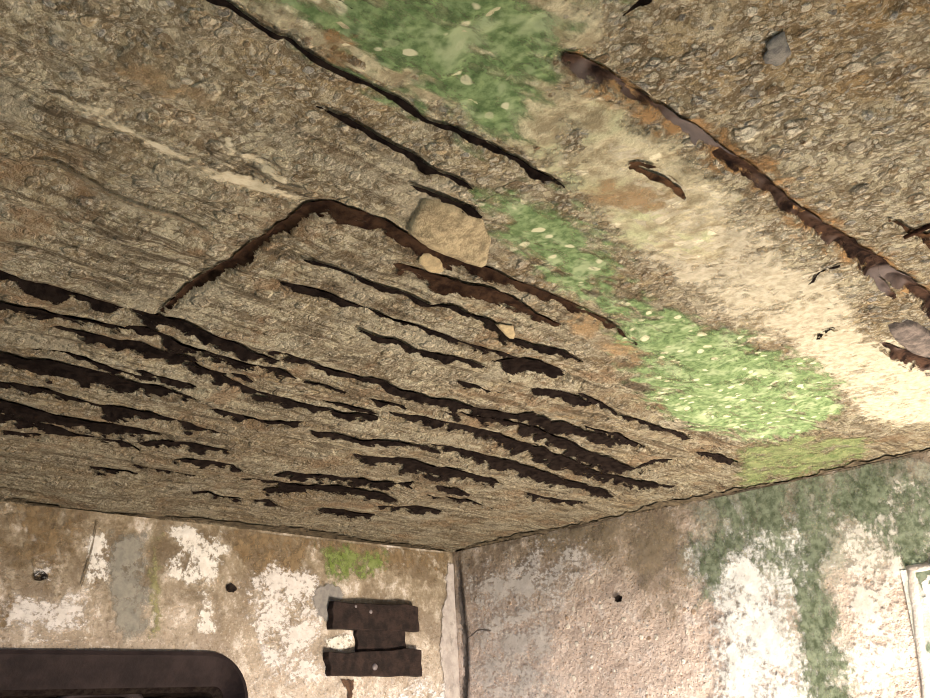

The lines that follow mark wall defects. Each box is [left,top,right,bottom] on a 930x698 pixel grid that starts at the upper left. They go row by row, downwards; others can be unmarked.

crack [623,0,652,16]
leakage [46,94,299,200]
crack [206,0,566,192]
crack [316,106,482,219]
crack [628,161,686,200]
leakage [612,146,930,425]
crack [0,259,930,698]
leakage [0,533,150,641]
leakage [167,525,449,693]
leakage [464,479,930,698]
rust [341,679,354,698]
leakage [363,678,445,698]